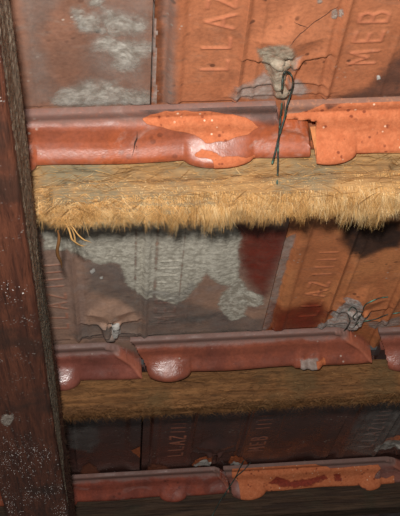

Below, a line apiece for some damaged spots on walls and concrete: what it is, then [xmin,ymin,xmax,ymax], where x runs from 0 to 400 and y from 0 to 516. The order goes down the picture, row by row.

spalling [143,110,258,169]
spalling [286,101,400,165]
water stain [0,0,263,503]
spalling [229,456,394,500]